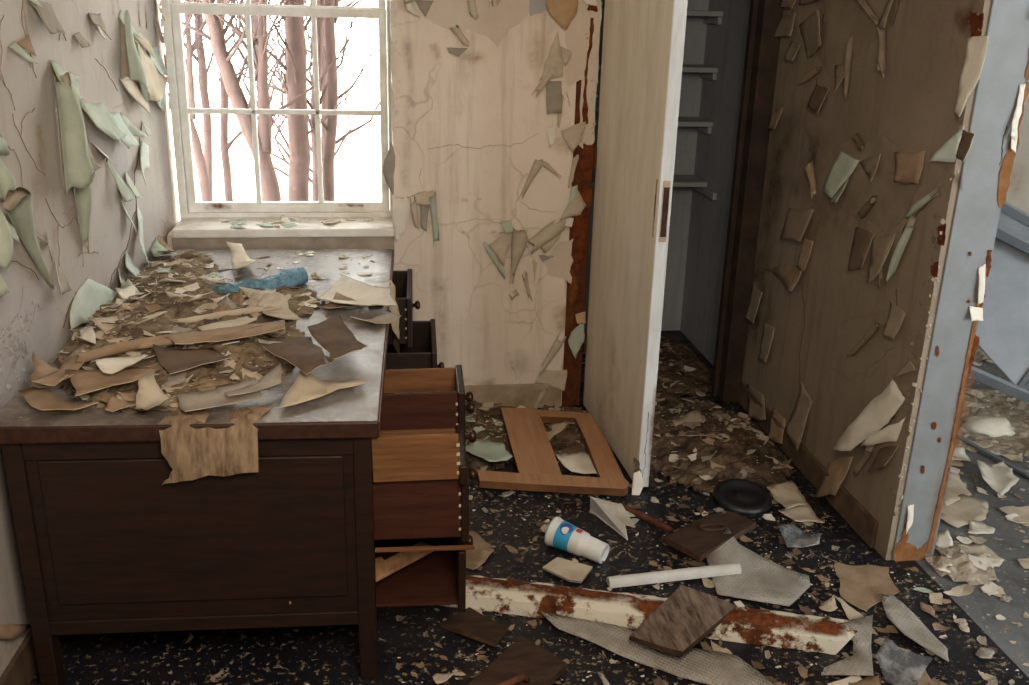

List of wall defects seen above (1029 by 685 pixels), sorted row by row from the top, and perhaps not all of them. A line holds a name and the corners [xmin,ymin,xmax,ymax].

crack [0,0,44,187]
crack [45,199,96,267]
peeling [0,0,286,407]
peeling [383,0,597,300]
peeling [765,36,989,381]
peeling [999,84,1026,165]
peeling [116,390,141,411]
peeling [534,312,586,408]
peeling [745,286,774,363]
peeling [747,317,812,450]
peeling [816,361,917,497]